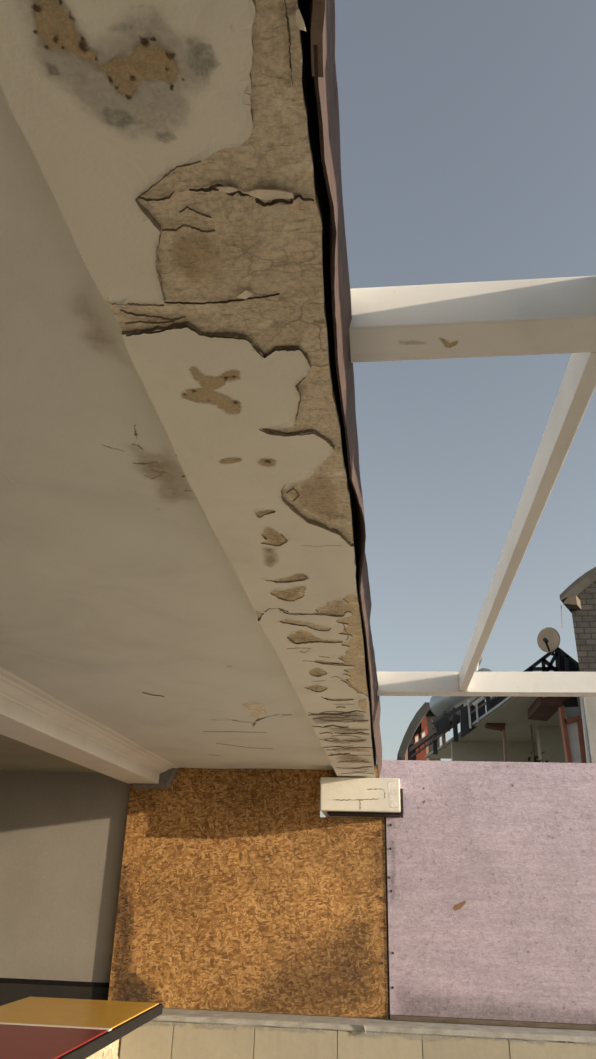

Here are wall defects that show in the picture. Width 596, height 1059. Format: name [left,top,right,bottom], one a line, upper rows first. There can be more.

spalling [108,0,353,547]
peeling [256,573,368,701]